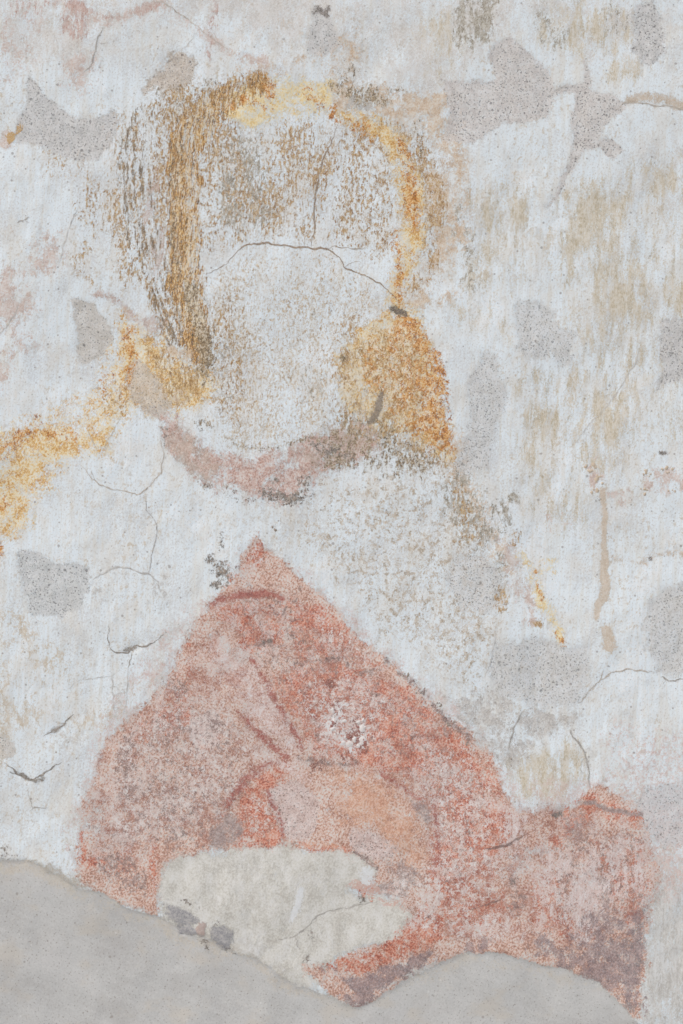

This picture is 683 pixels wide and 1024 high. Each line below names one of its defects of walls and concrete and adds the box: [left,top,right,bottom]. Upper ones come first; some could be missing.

crack [205,125,400,302]
crack [83,421,164,592]
crack [44,717,70,736]
crack [570,730,591,788]
crack [577,668,682,704]
peeling [156,837,414,990]